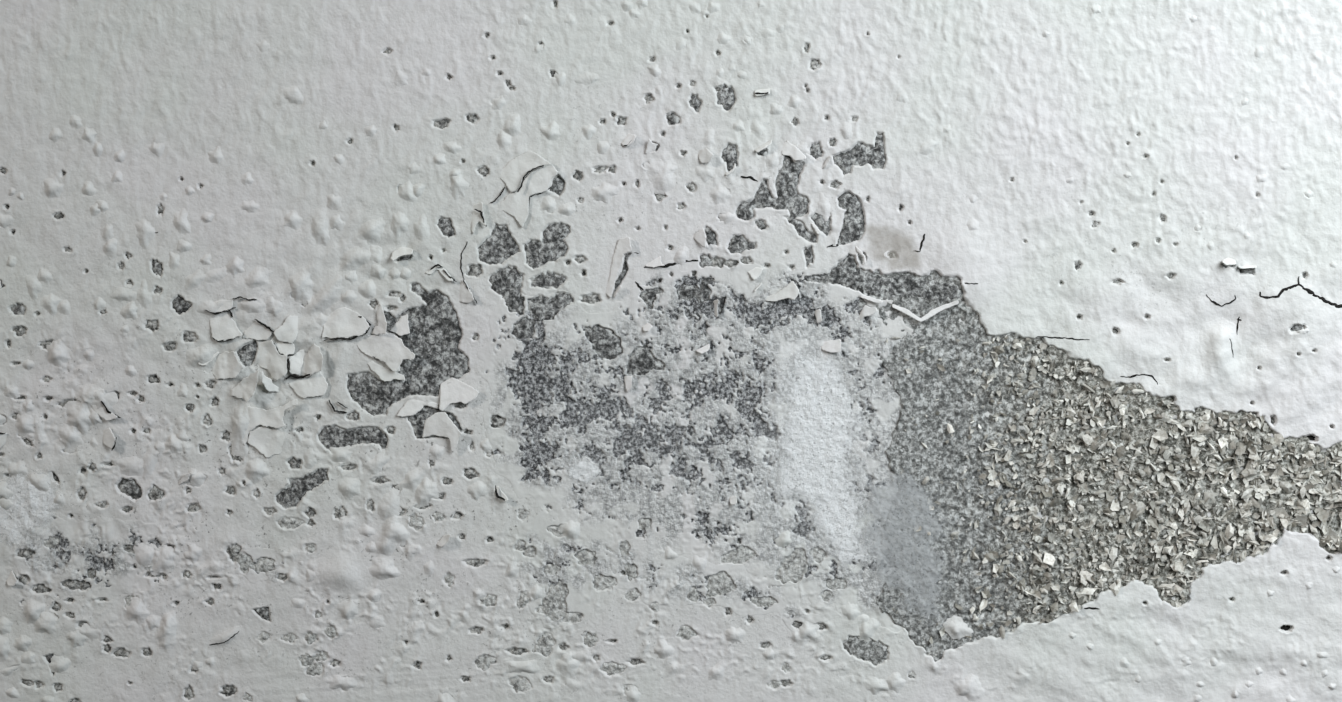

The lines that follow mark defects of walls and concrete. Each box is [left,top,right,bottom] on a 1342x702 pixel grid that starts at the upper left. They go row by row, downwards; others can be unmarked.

spalling [7,304,40,365]
spalling [145,320,159,332]
crack [1206,277,1342,358]
peeling [0,397,26,456]
spalling [152,133,1342,694]
spalling [184,667,197,700]